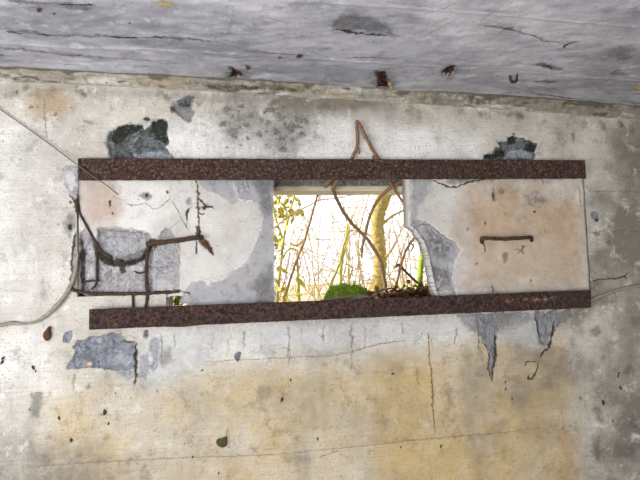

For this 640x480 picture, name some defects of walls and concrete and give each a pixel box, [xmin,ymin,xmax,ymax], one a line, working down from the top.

crack [479,0,574,49]
spalling [170,96,195,122]
spalling [107,117,173,159]
spalling [484,133,537,160]
spalling [62,166,192,308]
spalling [411,221,459,296]
spalling [63,331,136,379]
spalling [525,309,571,380]